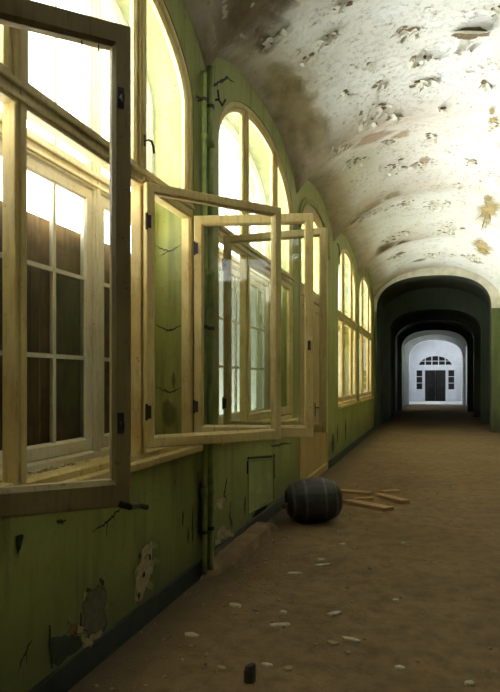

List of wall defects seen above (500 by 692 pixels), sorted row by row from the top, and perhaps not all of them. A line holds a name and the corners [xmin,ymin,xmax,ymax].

peeling [389,26,419,44]
peeling [451,27,492,56]
peeling [406,49,440,71]
crack [213,76,233,87]
peeling [409,78,438,93]
peeling [358,103,403,133]
peeling [134,538,160,604]
spalling [48,613,103,668]